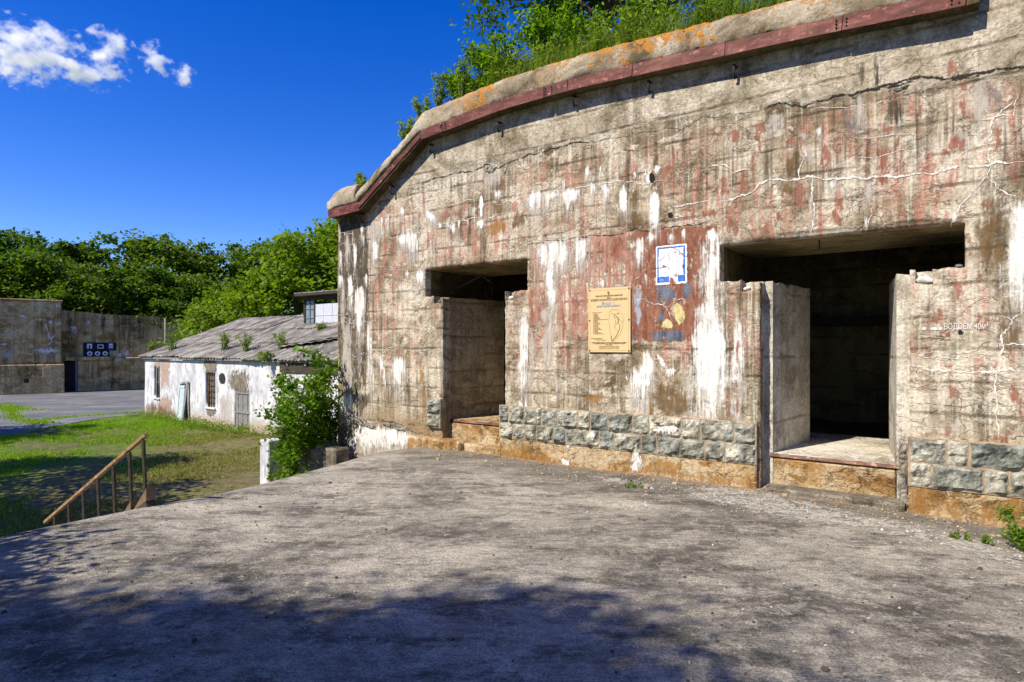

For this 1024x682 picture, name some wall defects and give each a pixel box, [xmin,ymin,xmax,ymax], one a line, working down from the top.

crack [372,94,1024,318]
crack [409,66,1024,189]
peeling [717,123,765,194]
peeling [528,209,737,378]
crack [900,311,1024,437]